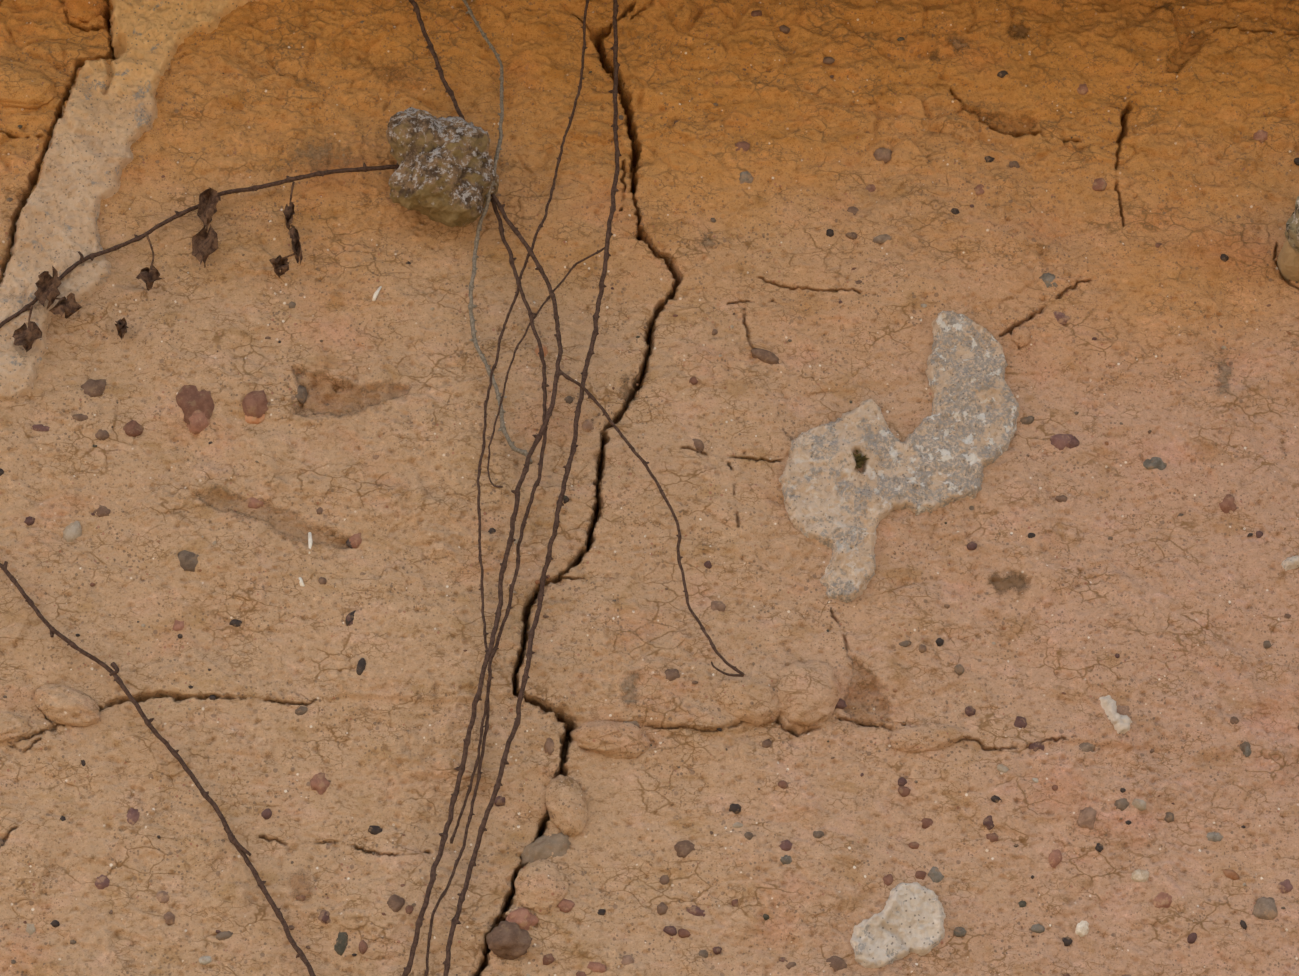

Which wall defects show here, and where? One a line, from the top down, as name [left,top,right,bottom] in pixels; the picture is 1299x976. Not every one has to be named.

crack [0,0,115,284]
flaking render [0,0,260,402]
crack [950,88,1132,226]
crack [727,276,876,349]
crack [999,279,1091,349]
crack [512,0,683,777]
crack [681,446,787,527]
flaking render [779,310,1020,603]
crack [98,690,333,711]
crack [776,609,906,737]
crack [474,811,550,976]
flaking render [850,882,946,968]